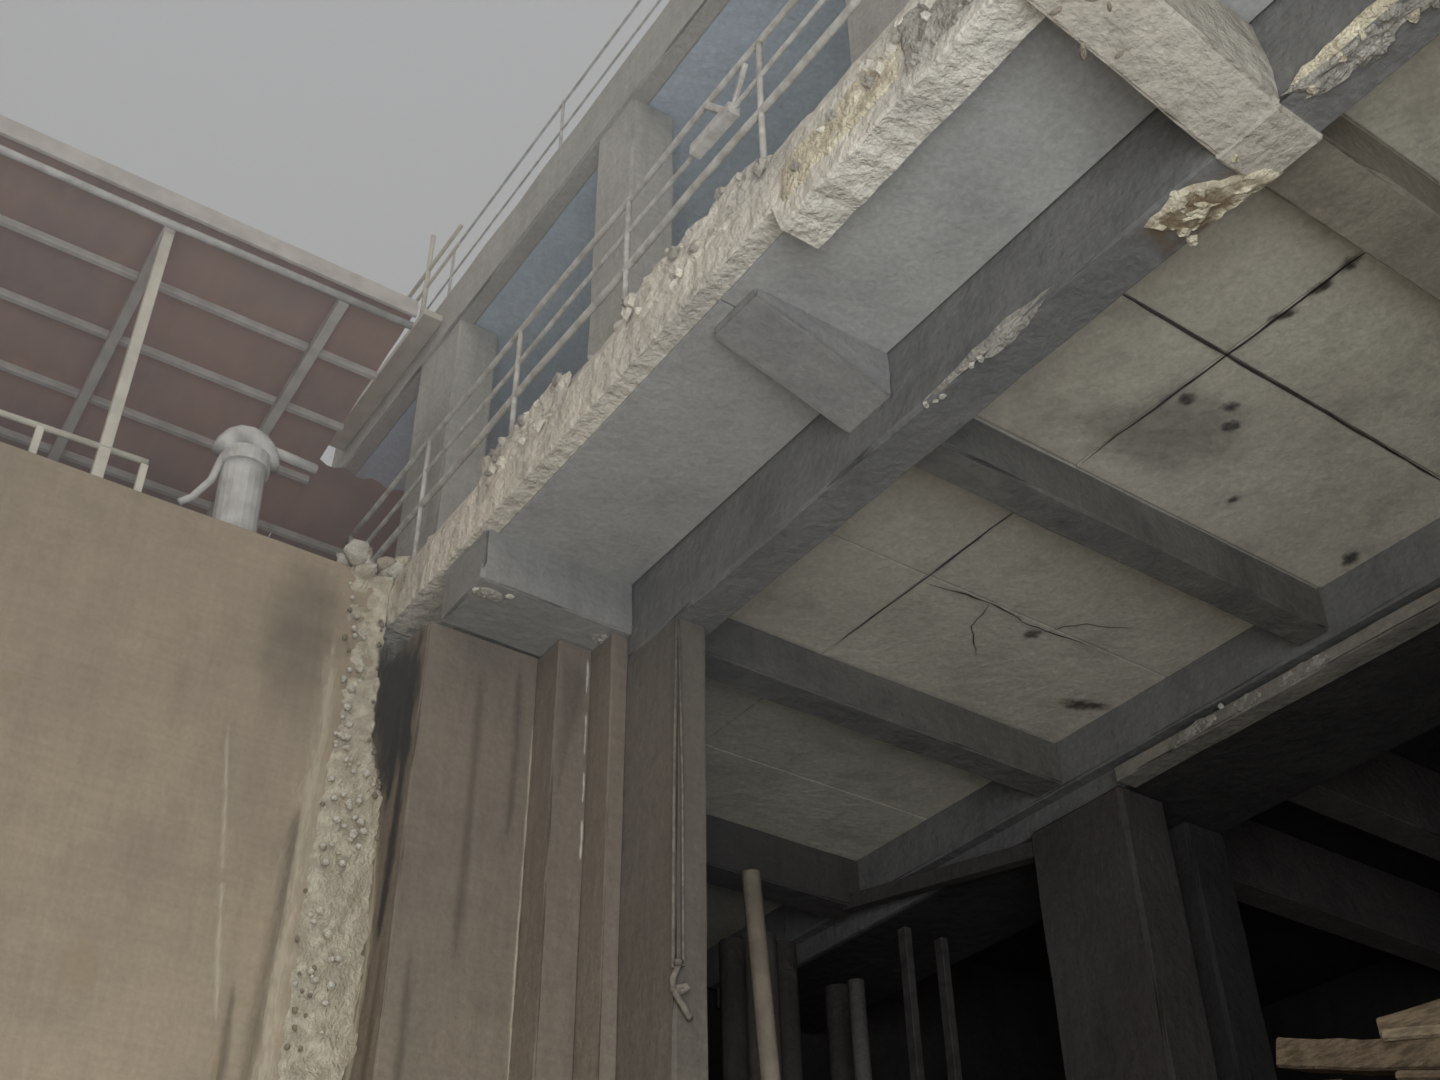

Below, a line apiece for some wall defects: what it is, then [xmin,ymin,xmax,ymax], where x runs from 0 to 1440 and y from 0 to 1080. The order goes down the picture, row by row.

spalling [1281,0,1440,99]
spalling [620,0,973,331]
spalling [1144,154,1283,246]
spalling [478,371,572,497]
spalling [922,287,1051,408]
crack [1082,253,1440,480]
spalling [259,572,394,1080]
leakage [374,636,421,936]